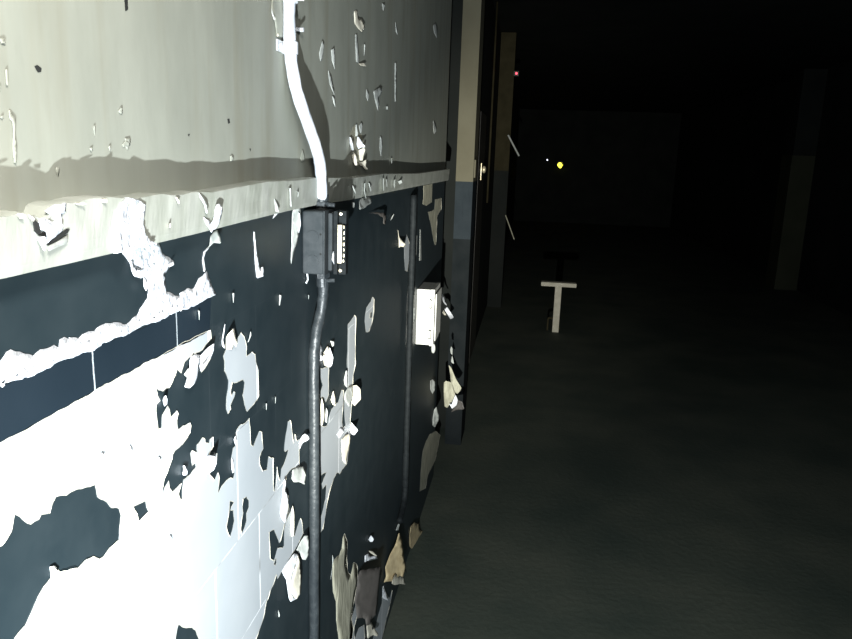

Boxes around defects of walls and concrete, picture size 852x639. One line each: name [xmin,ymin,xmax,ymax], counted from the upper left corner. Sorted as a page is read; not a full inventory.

peeling [354,10,366,66]
peeling [319,41,335,106]
peeling [366,63,397,110]
peeling [0,110,17,163]
peeling [349,123,368,170]
peeling [352,183,394,224]
peeling [0,188,310,639]
peeling [319,297,374,531]
peeling [420,347,464,491]
peeling [330,522,423,639]